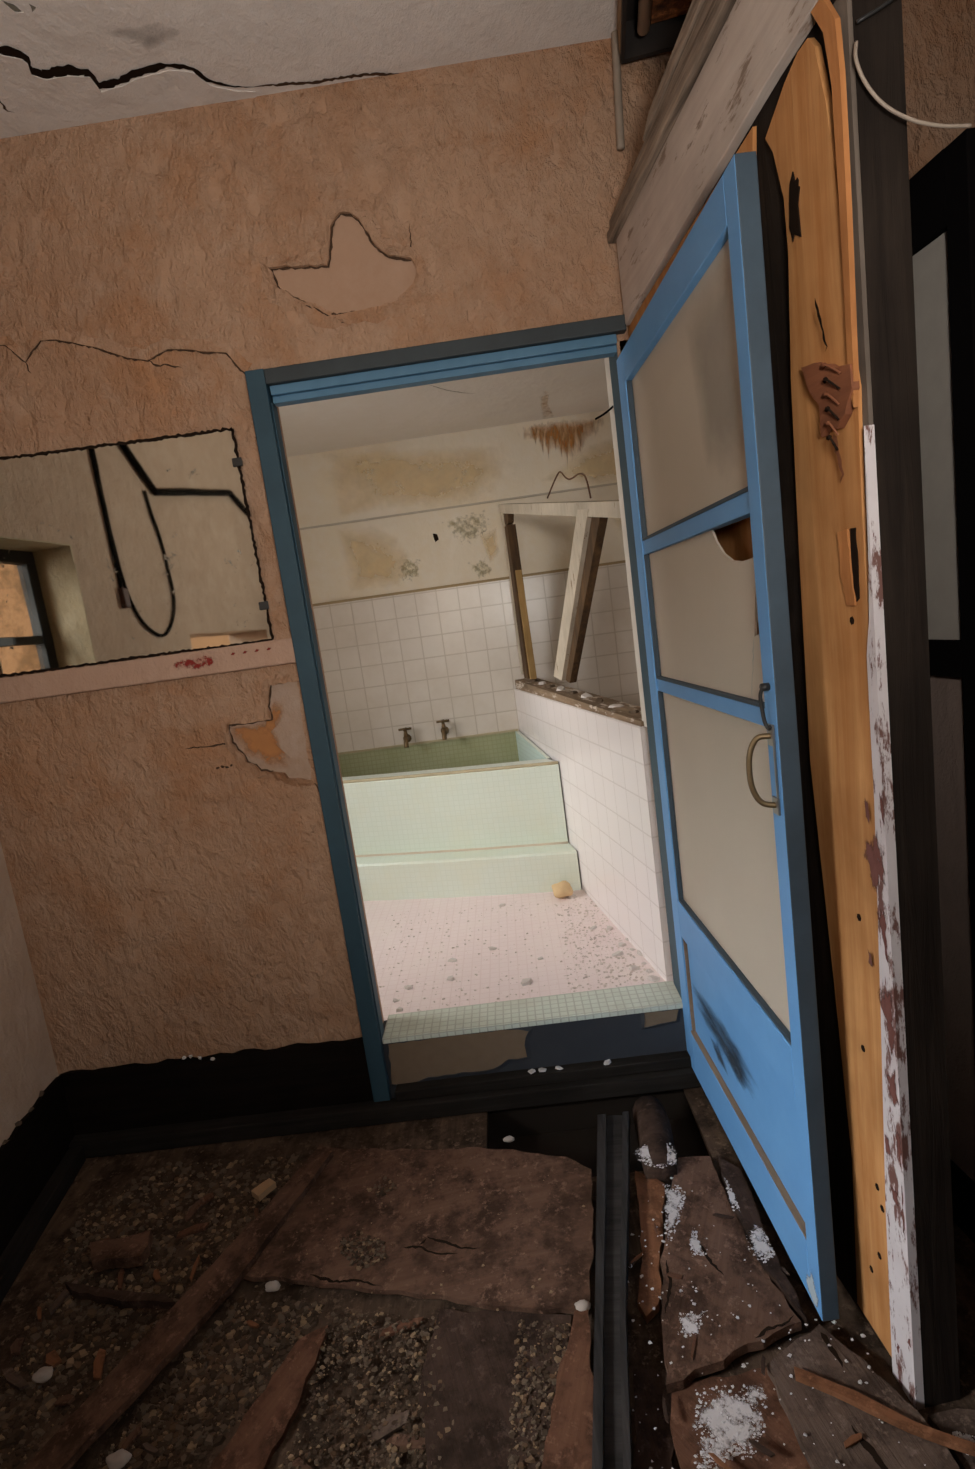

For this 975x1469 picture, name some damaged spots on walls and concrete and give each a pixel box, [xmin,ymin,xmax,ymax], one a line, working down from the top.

crack [0,46,400,112]
crack [0,329,253,374]
flaking render [186,673,319,791]
peeling [864,793,885,889]
peeling [868,910,888,967]
peeling [879,988,899,1107]
peeling [885,1125,905,1232]